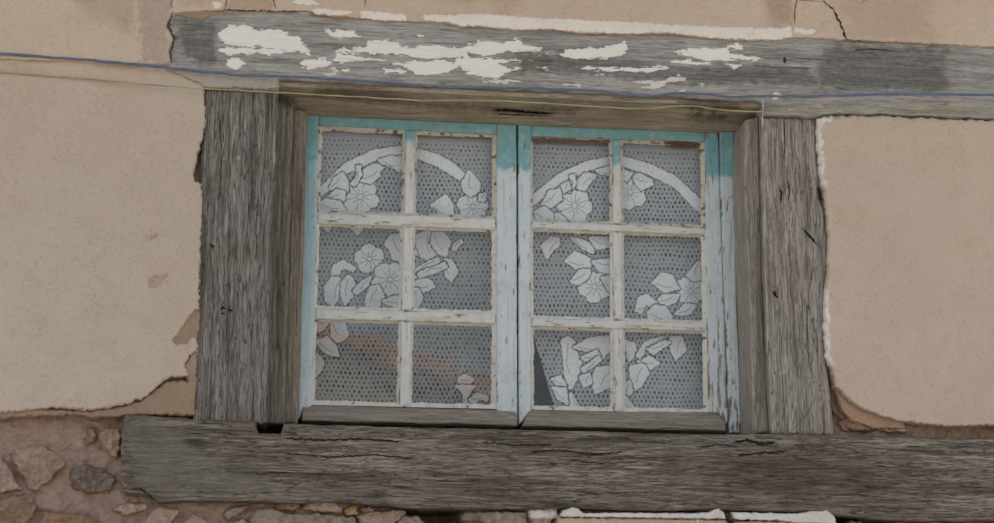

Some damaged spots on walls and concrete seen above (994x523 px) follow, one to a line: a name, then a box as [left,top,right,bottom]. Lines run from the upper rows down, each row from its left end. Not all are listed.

crack [222,0,300,12]
peeling [175,0,761,92]
crack [794,0,863,42]
spalling [0,310,200,420]
spalling [827,371,907,430]